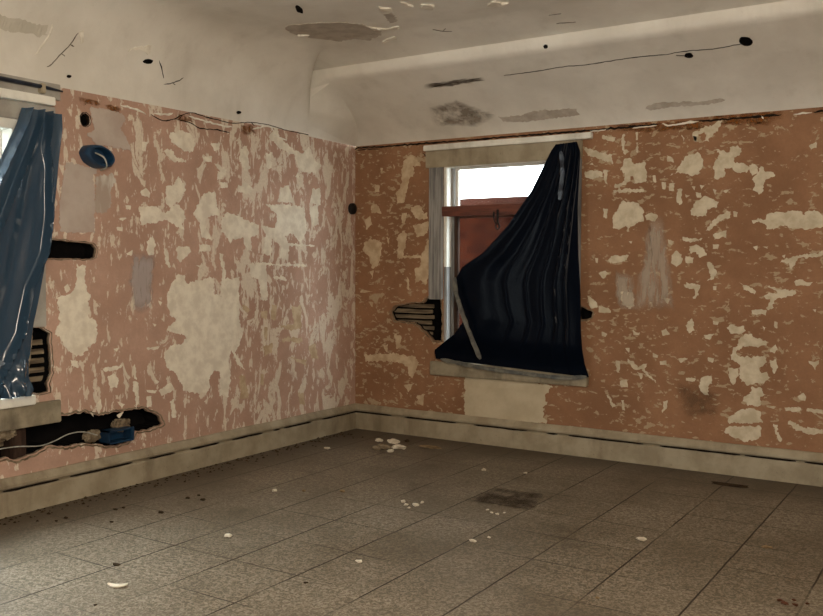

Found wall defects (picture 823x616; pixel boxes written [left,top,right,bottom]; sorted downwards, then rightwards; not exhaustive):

peeling [285,7,399,43]
flaking render [80,105,173,151]
damp [439,103,488,125]
peeling [253,125,321,179]
peeling [363,155,429,290]
peeling [584,121,775,299]
peeling [752,210,823,230]
peeling [0,143,321,464]
flaking render [390,296,443,343]
peeling [743,279,812,315]
peeling [704,321,823,442]
damp [478,489,537,508]